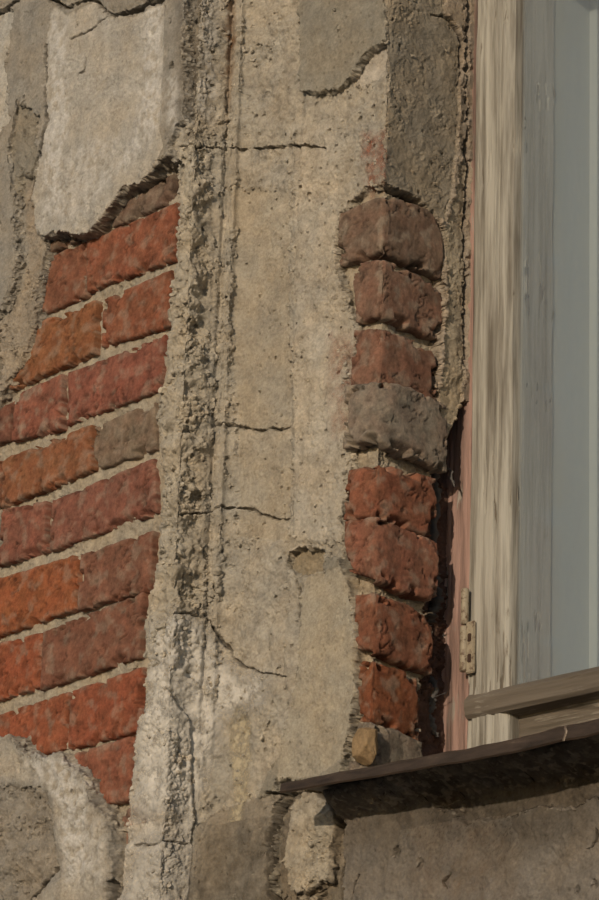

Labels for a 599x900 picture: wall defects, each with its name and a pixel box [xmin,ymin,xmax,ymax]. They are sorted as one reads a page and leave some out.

crack [0,0,20,16]
crack [53,0,165,74]
crack [181,142,327,152]
flaking render [0,0,461,900]
crack [215,421,292,432]
crack [179,504,294,521]
crack [173,610,287,677]
flaking render [335,734,599,823]